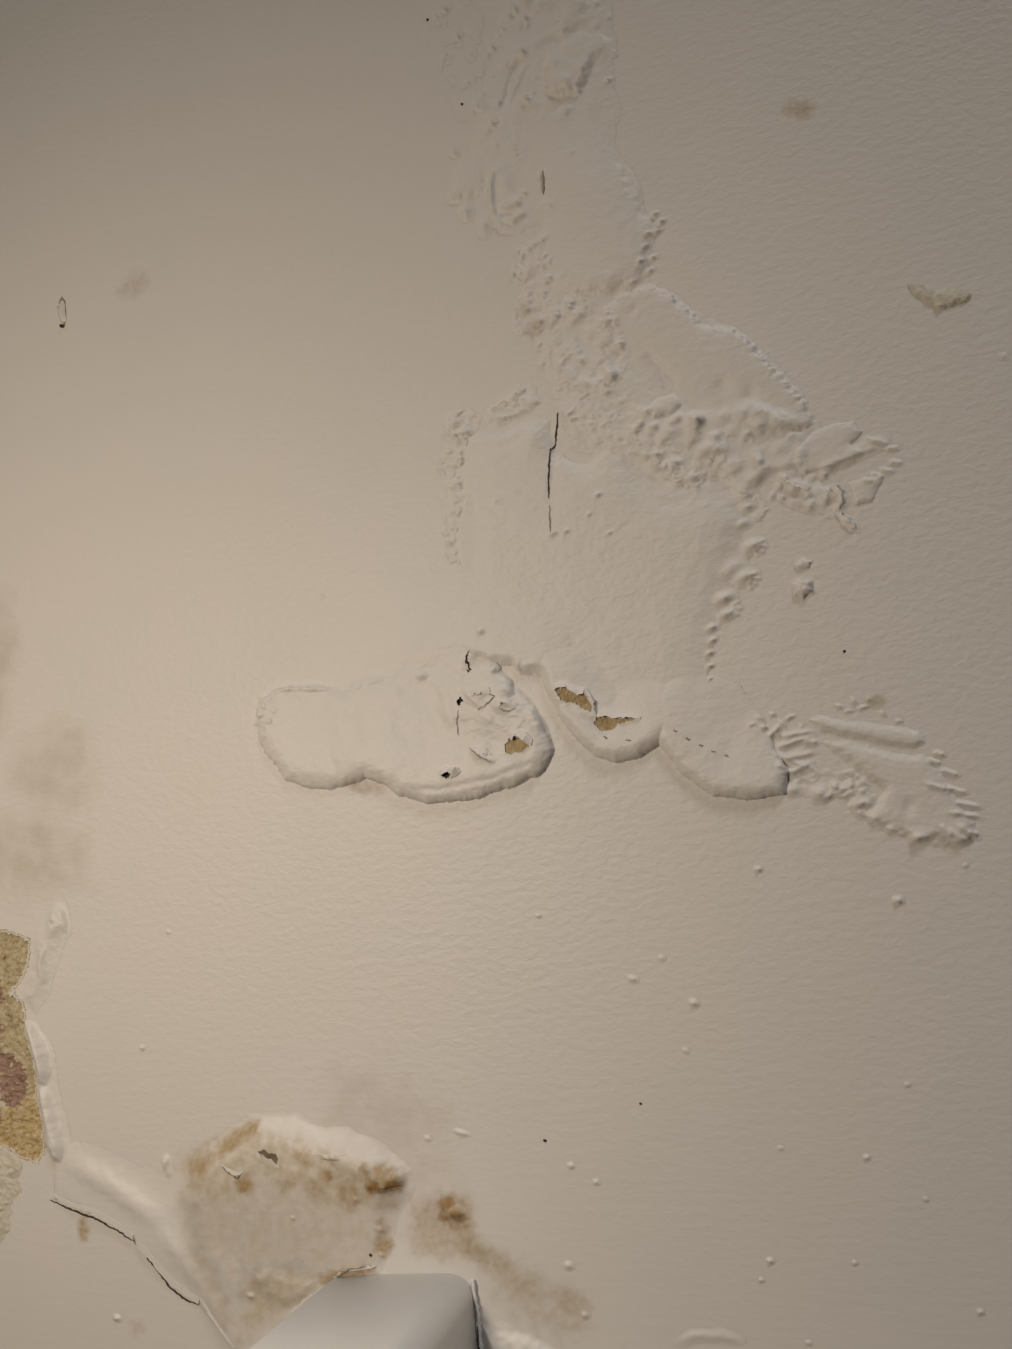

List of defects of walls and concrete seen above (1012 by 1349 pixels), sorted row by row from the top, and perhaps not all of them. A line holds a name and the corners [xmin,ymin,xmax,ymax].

crack [548,413,558,533]
peeling [253,638,792,805]
spalling [0,929,46,1164]